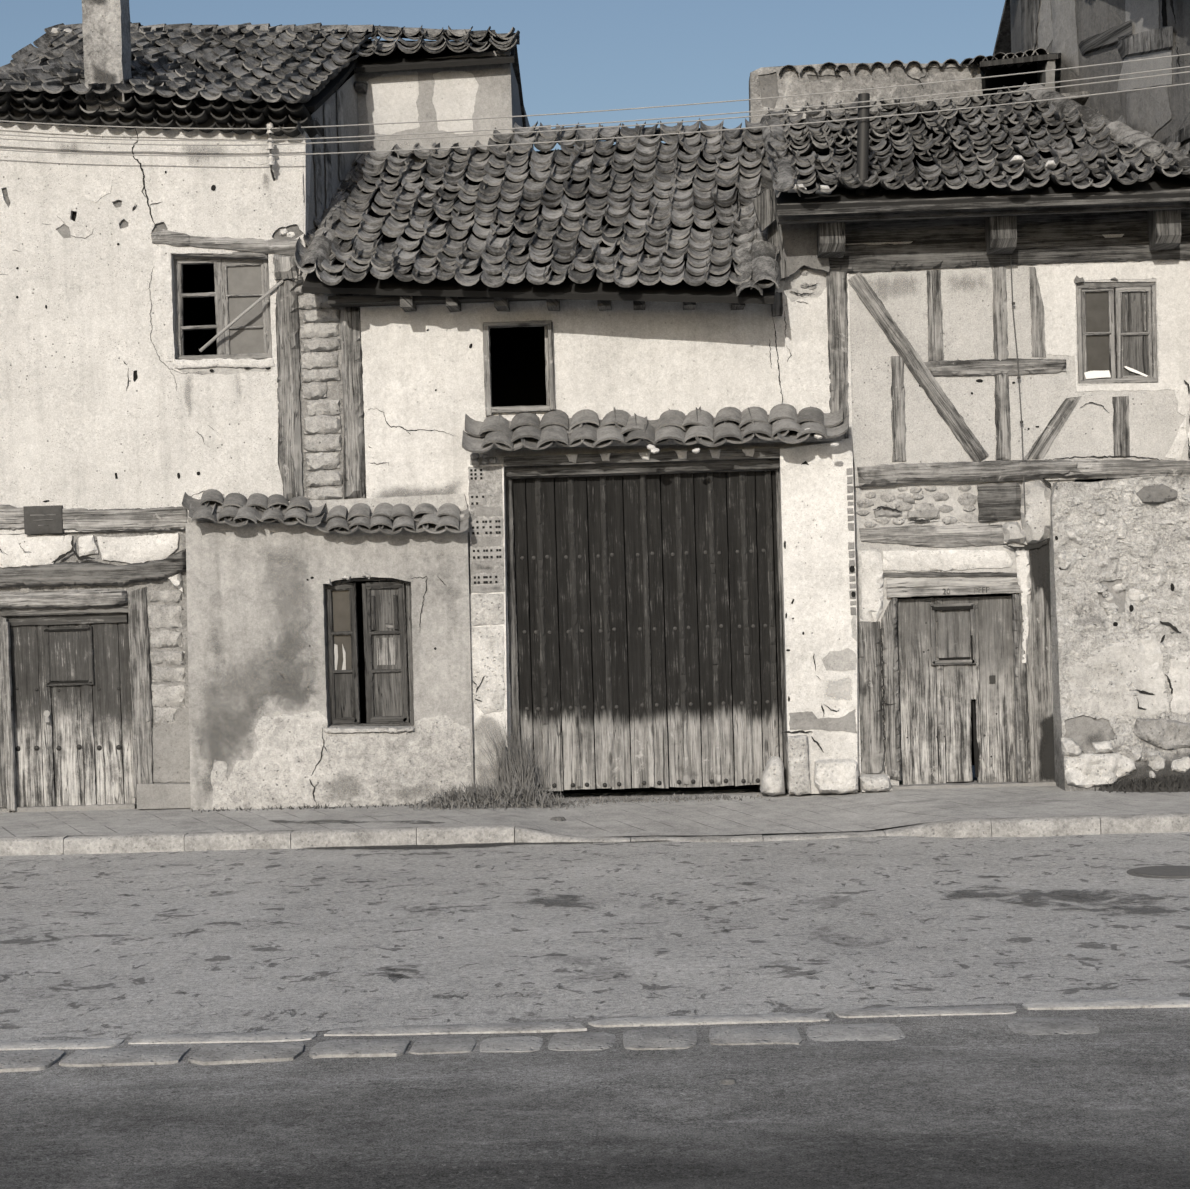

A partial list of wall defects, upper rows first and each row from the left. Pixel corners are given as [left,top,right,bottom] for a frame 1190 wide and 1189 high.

crack [132,128,161,227]
spalling [56,212,77,238]
spalling [113,200,129,229]
crack [368,408,453,436]
peeling [1168,651,1190,714]
spalling [1064,715,1115,751]
crack [310,728,327,806]